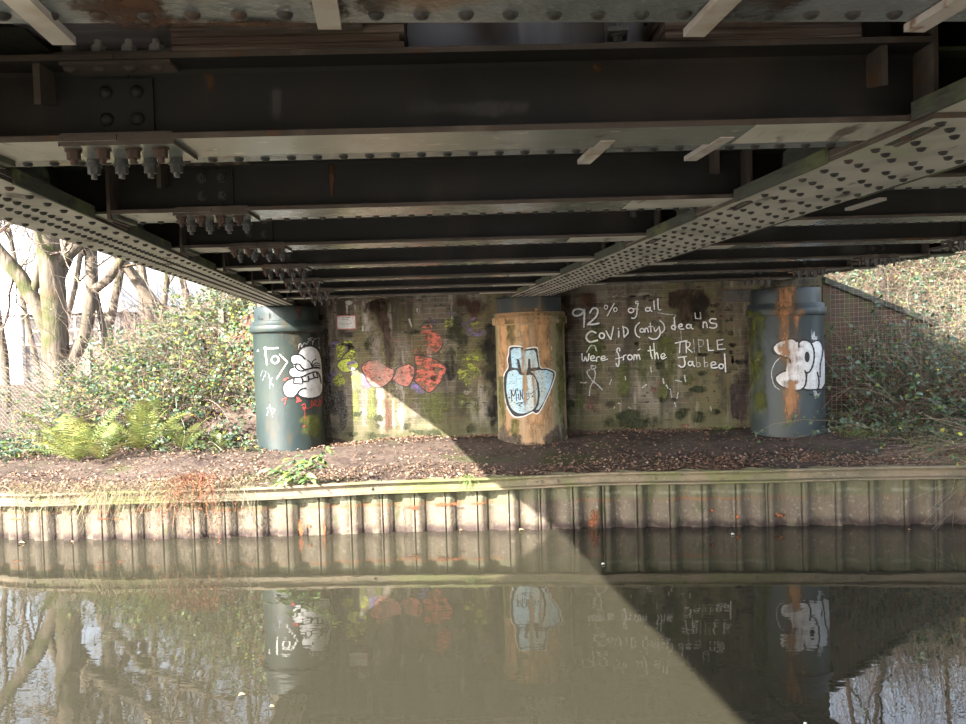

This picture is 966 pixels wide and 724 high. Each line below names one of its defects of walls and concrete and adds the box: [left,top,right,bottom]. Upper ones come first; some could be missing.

rust [71,0,190,30]
rust [338,0,383,17]
leakage [345,299,408,370]
leakage [668,289,719,328]
rust [775,286,803,419]
leakage [377,380,405,432]
leakage [730,352,750,423]